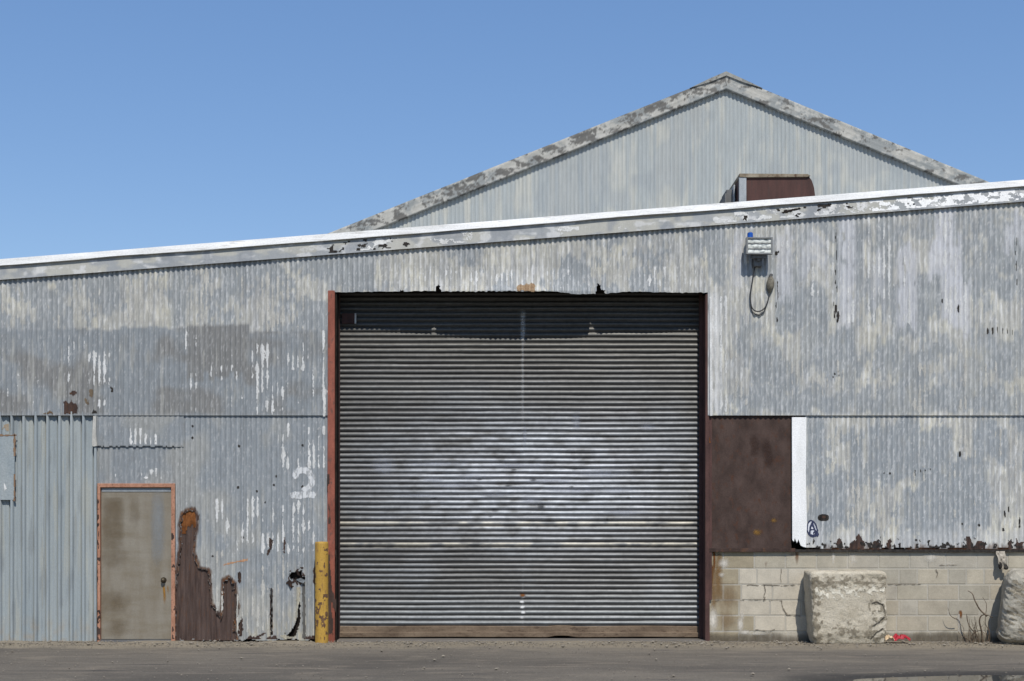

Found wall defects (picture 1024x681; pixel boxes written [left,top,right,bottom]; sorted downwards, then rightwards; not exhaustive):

peeling [355,237,398,251]
peeling [430,231,472,245]
peeling [712,189,1024,415]
corrosion [43,389,97,414]
corrosion [836,534,892,550]
corrosion [961,523,985,550]
corrosion [1002,507,1024,550]
corrosion [163,508,291,640]
crack [871,565,944,639]